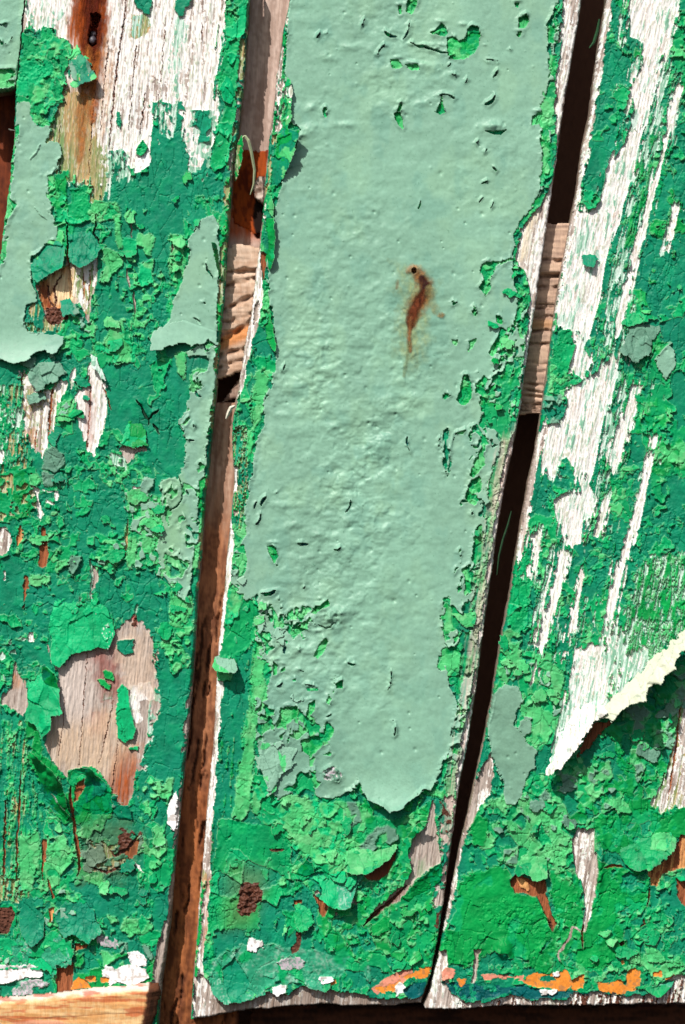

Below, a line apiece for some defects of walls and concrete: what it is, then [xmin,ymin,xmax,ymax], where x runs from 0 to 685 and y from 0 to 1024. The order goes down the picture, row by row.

rust [75,0,107,161]
peeling [0,0,250,208]
peeling [0,231,112,459]
peeling [103,316,218,352]
rust [405,266,431,355]
peeling [0,486,49,568]
peeling [119,421,148,464]
peeling [192,0,685,1019]
peeling [1,549,190,825]
peeling [167,792,181,833]
peeling [0,840,103,992]
peeling [98,872,157,906]